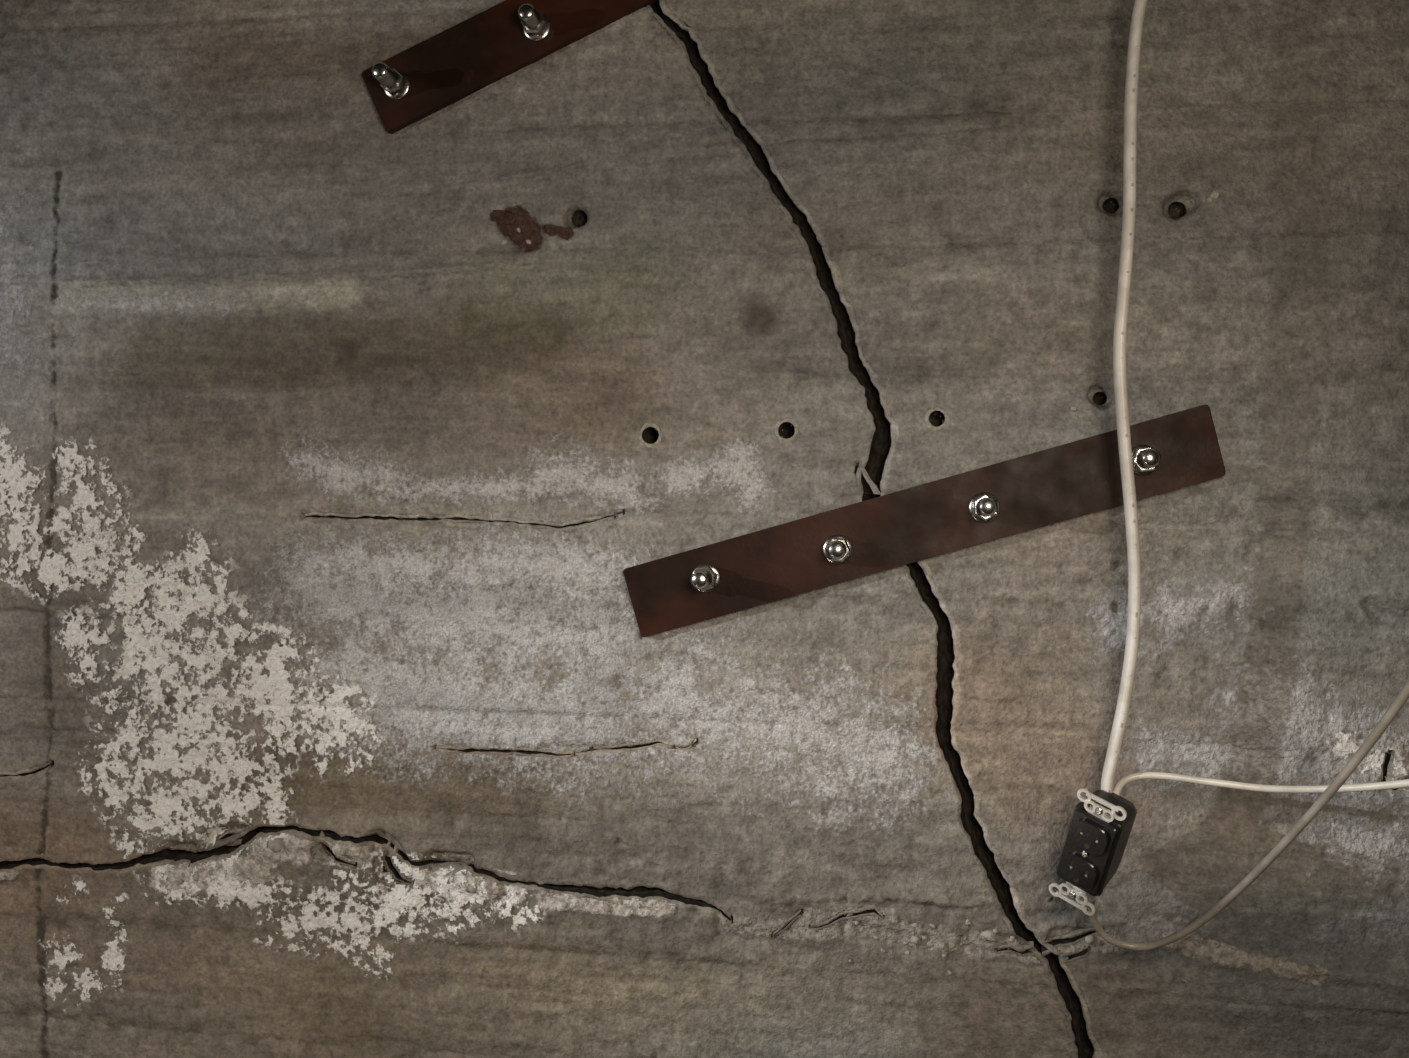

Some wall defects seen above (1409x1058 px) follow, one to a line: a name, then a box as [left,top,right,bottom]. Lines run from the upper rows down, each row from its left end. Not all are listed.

crack [646,0,899,502]
water stain [0,191,46,418]
water stain [56,289,237,319]
crack [302,509,624,531]
water stain [0,424,941,1011]
crack [436,739,698,759]
crack [902,560,1103,1058]
spalling [1389,740,1409,791]
spalling [0,870,19,881]
crack [0,821,732,924]
spalling [149,825,677,917]
crack [772,904,883,939]